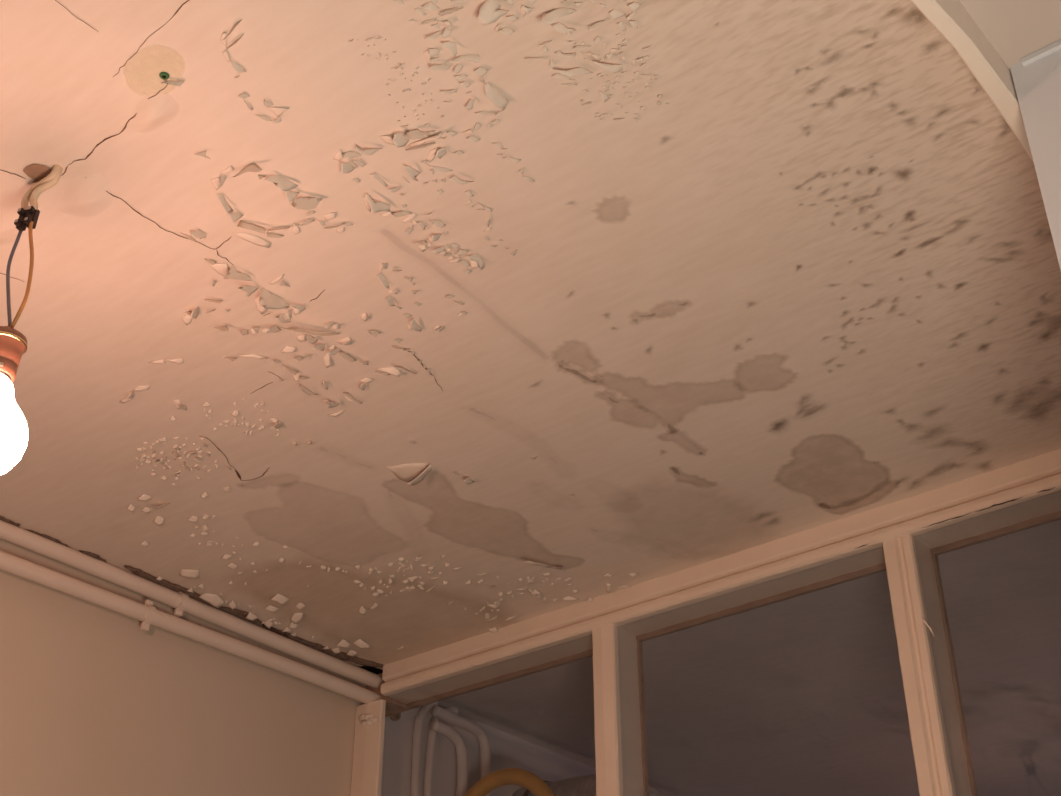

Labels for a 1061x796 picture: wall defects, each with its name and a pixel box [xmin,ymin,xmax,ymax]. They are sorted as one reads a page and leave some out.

crack [113,0,189,77]
peeling [220,20,247,78]
crack [61,86,233,265]
peeling [237,93,290,125]
peeling [210,163,353,248]
peeling [334,0,535,275]
peeling [181,259,444,417]
peeling [135,398,282,486]
flaking render [0,516,106,562]
flaking render [124,514,384,668]